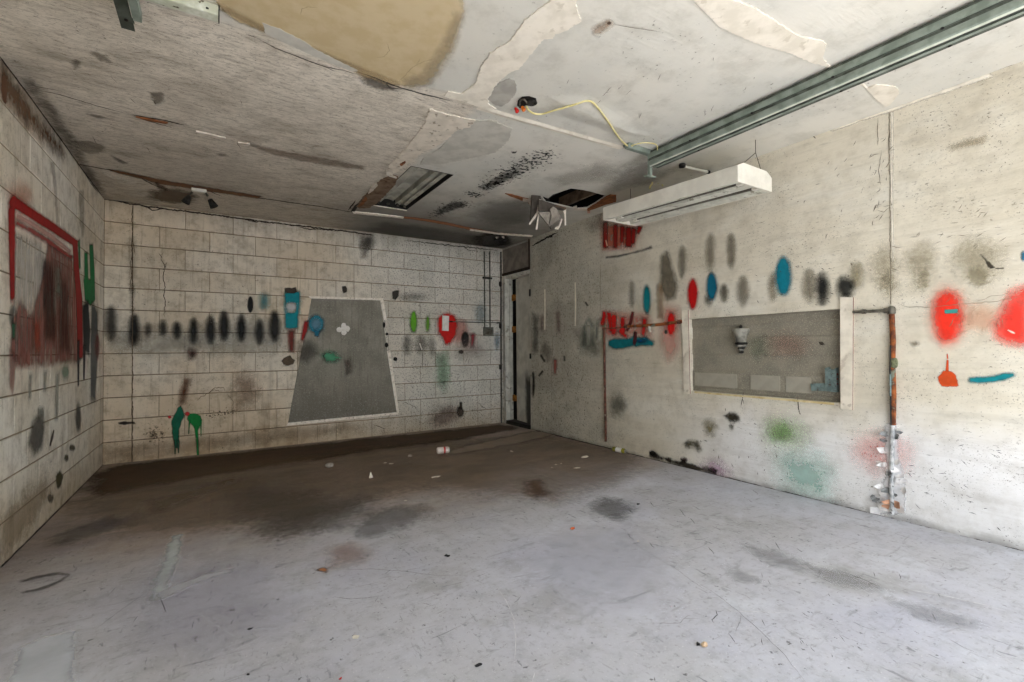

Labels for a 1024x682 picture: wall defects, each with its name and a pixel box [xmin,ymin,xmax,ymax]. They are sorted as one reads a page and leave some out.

peeling [352,0,581,219]
damp [429,146,557,218]
peeling [694,0,830,67]
peeling [830,73,991,261]